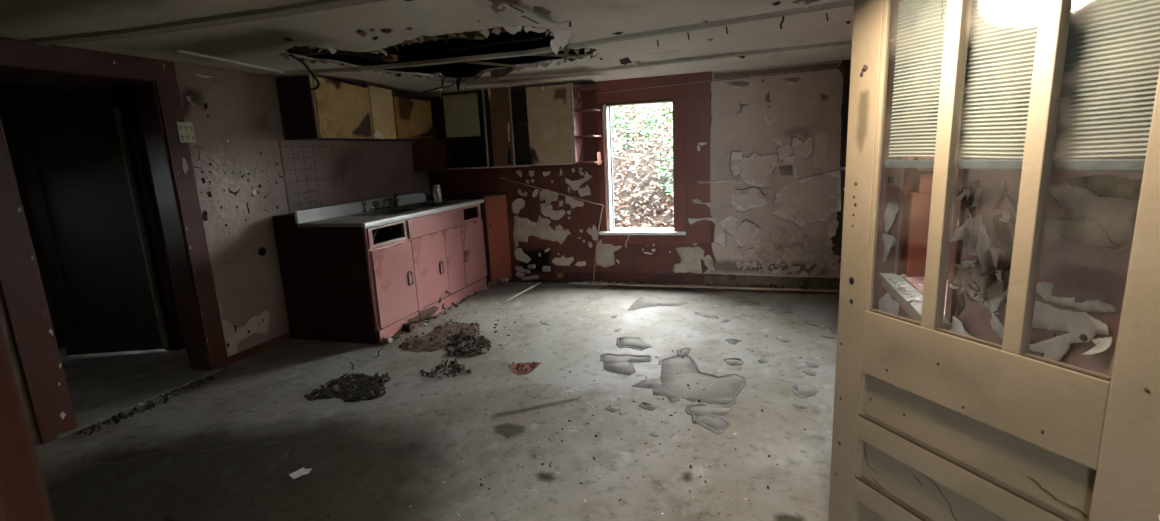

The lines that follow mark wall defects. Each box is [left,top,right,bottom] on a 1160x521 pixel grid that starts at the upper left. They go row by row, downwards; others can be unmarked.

peeling [356,28,413,40]
peeling [512,167,622,268]
peeling [669,79,857,274]
peeling [944,180,1017,339]
peeling [219,304,270,357]